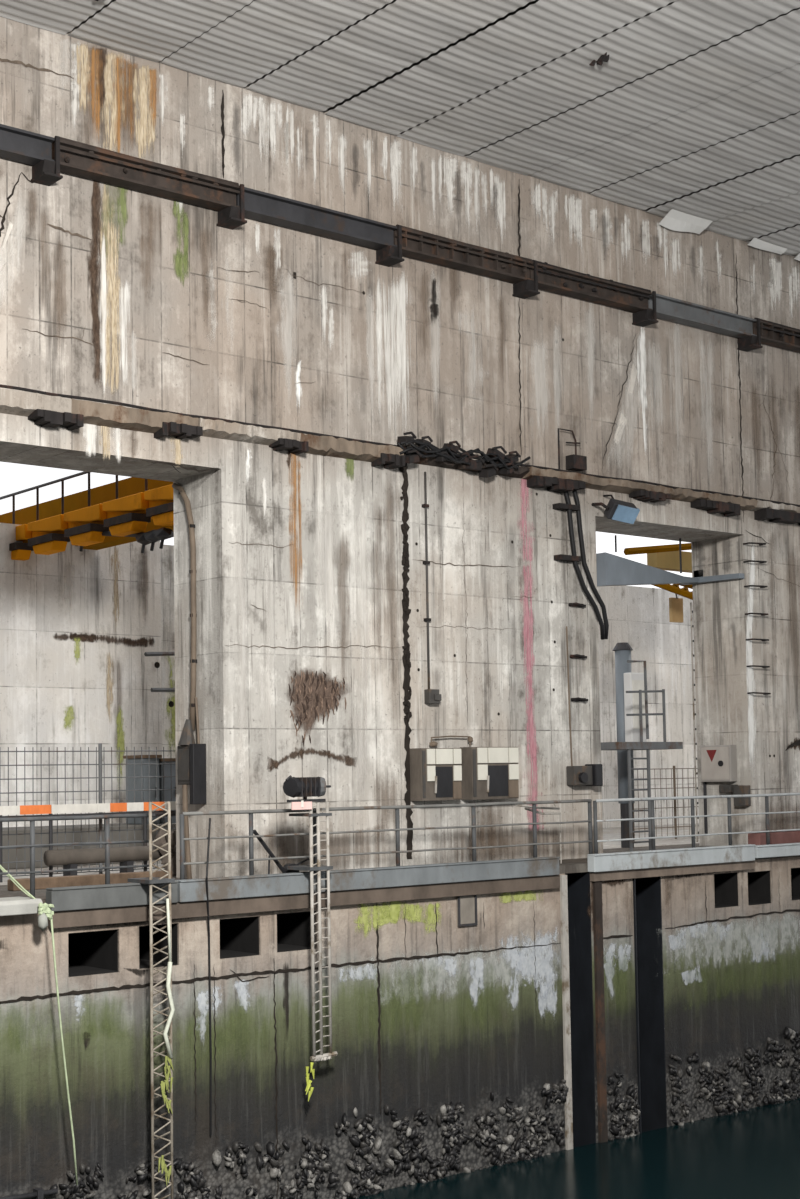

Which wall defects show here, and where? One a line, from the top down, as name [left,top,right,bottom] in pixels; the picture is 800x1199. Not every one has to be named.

corrosion [72,42,164,158]
crack [0,172,34,237]
water stain [364,137,506,234]
water stain [352,253,368,276]
water stain [376,277,409,416]
crack [602,337,635,468]
water stain [197,987,221,1039]
water stain [235,980,250,1010]
water stain [340,959,377,981]
water stain [381,930,557,1016]
water stain [604,944,631,996]
water stain [669,914,800,985]